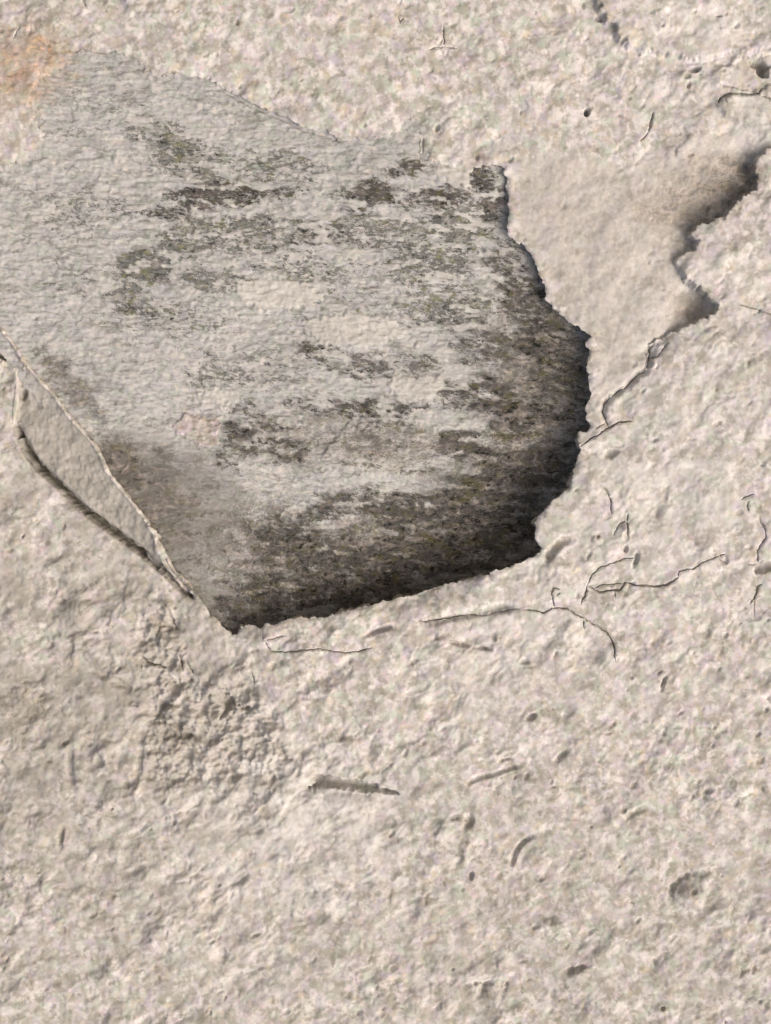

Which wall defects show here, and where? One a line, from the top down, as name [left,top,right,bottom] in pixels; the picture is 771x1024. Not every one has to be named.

damp [18,82,589,625]
spalling [0,46,771,794]
crack [418,487,768,661]
crack [579,341,670,448]